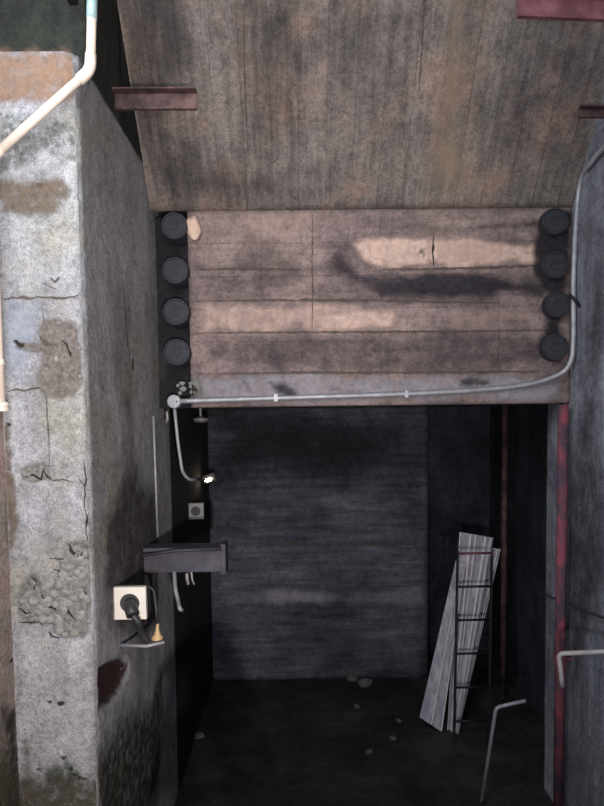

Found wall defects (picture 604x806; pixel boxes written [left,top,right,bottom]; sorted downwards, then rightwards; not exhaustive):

water stain [334,211,571,297]
spalling [13,320,83,397]
water stain [542,316,560,340]
spalling [17,541,92,638]
water stain [0,710,20,806]